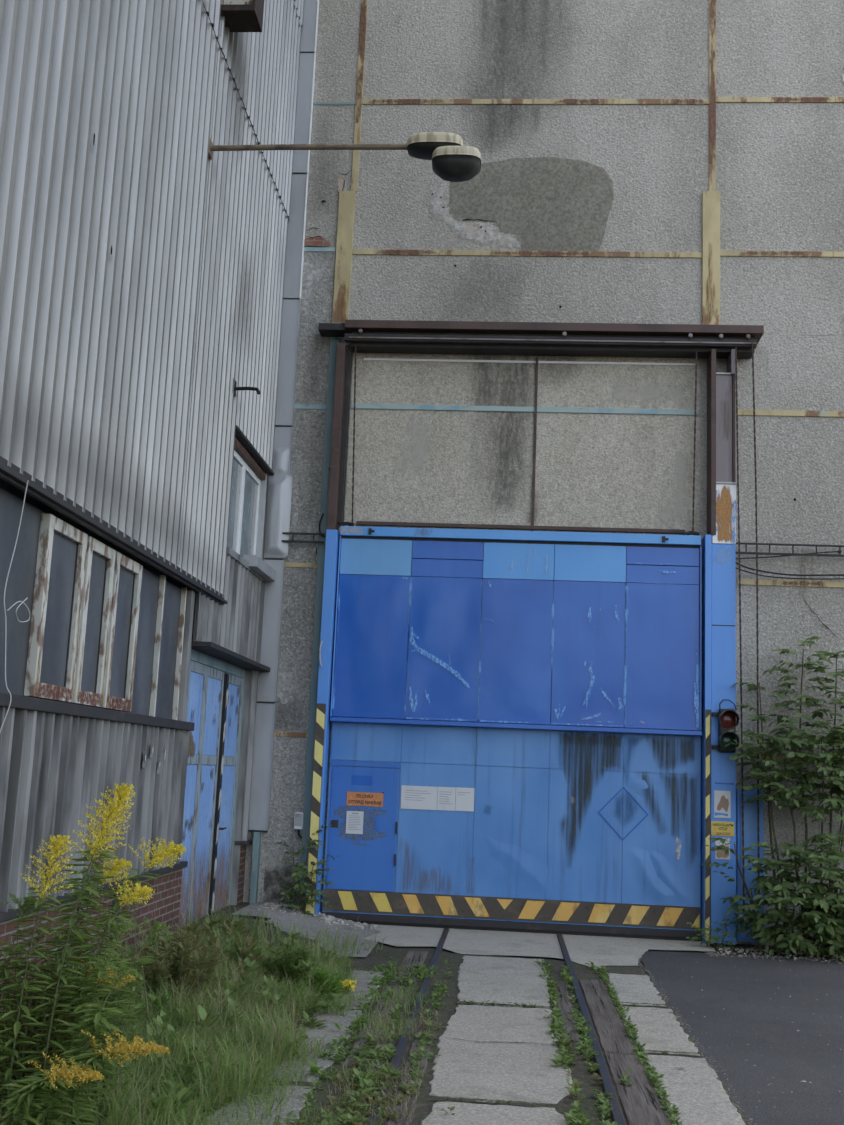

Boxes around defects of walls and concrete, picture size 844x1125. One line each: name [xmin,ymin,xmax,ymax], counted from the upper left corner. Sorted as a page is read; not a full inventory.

peeling [430,189,520,248]
corrosion [716,486,733,542]